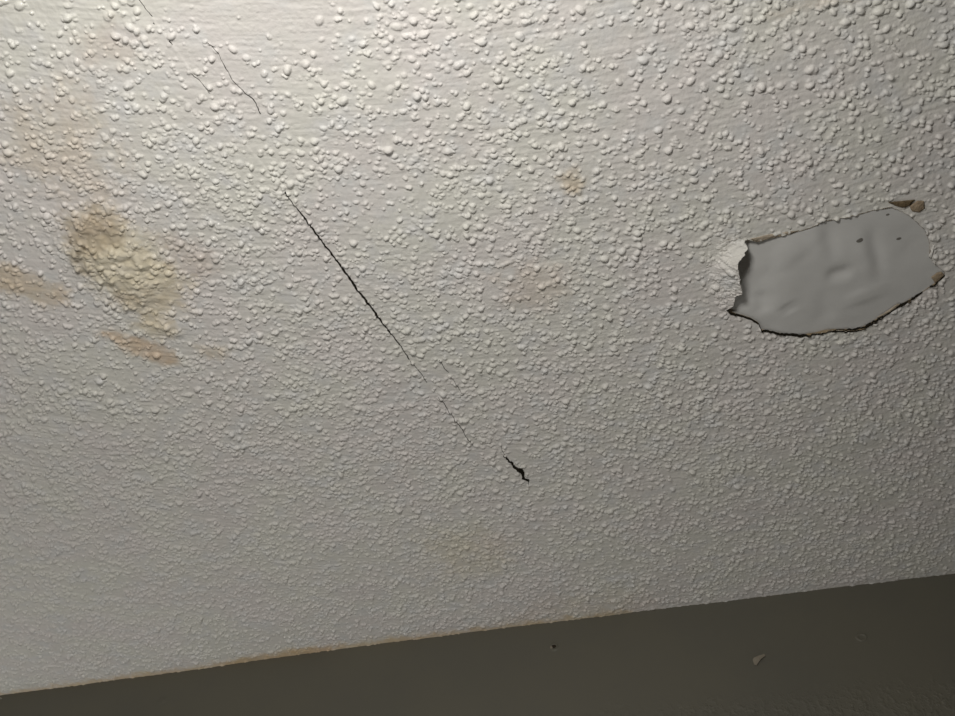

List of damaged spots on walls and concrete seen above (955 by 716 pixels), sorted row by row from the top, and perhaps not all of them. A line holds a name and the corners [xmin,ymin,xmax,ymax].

crack [206,42,261,114]
damp [0,4,237,372]
crack [284,192,473,445]
peeling [705,200,945,338]
crack [501,447,529,485]